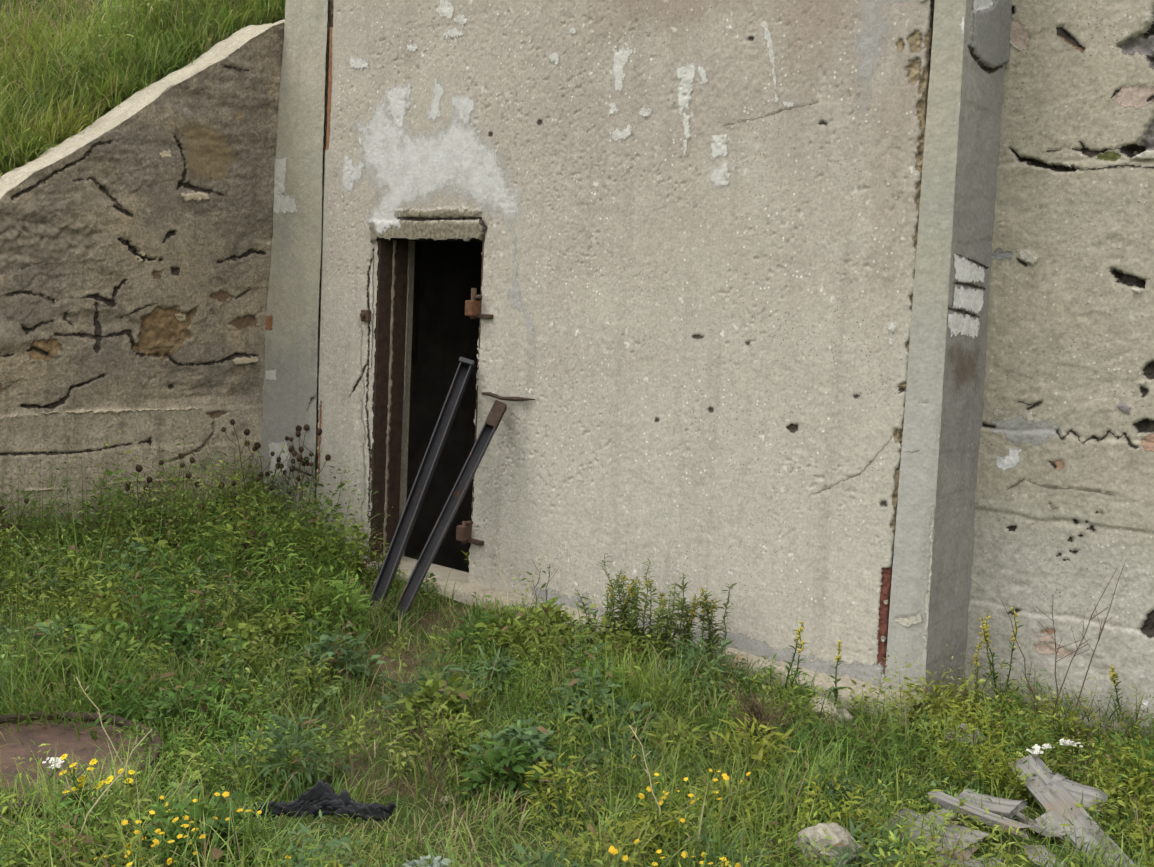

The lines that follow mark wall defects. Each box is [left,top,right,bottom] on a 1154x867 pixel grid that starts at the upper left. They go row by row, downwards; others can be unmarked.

peeling [959,0,993,34]
spalling [1056,27,1086,53]
spalling [1117,13,1154,69]
rust [326,0,334,150]
crack [11,141,122,207]
crack [1011,141,1154,172]
spalling [0,212,98,275]
leakage [342,76,536,365]
crack [0,280,258,409]
crack [0,411,226,462]
crack [1056,430,1138,448]
rust [877,567,892,675]